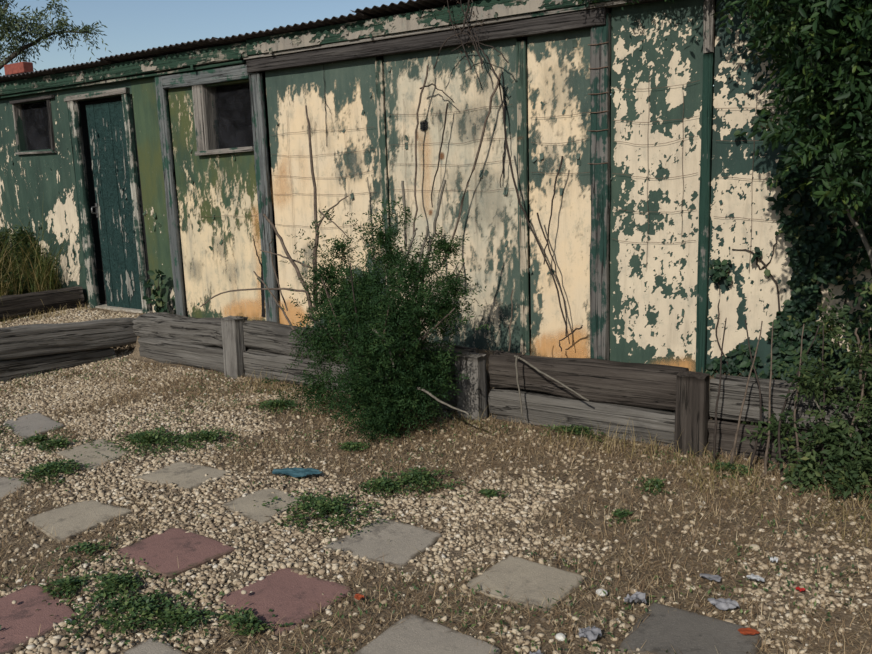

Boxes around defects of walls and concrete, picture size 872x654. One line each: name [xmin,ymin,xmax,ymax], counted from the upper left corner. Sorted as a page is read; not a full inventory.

peeling [253,9,449,54]
peeling [464,0,593,22]
peeling [0,128,80,287]
peeling [90,119,161,256]
peeling [172,96,266,321]
peeling [271,46,519,345]
peeling [527,40,591,358]
peeling [610,11,799,363]
peeling [104,270,135,302]
corrosion [537,330,587,358]
peeling [816,211,872,358]